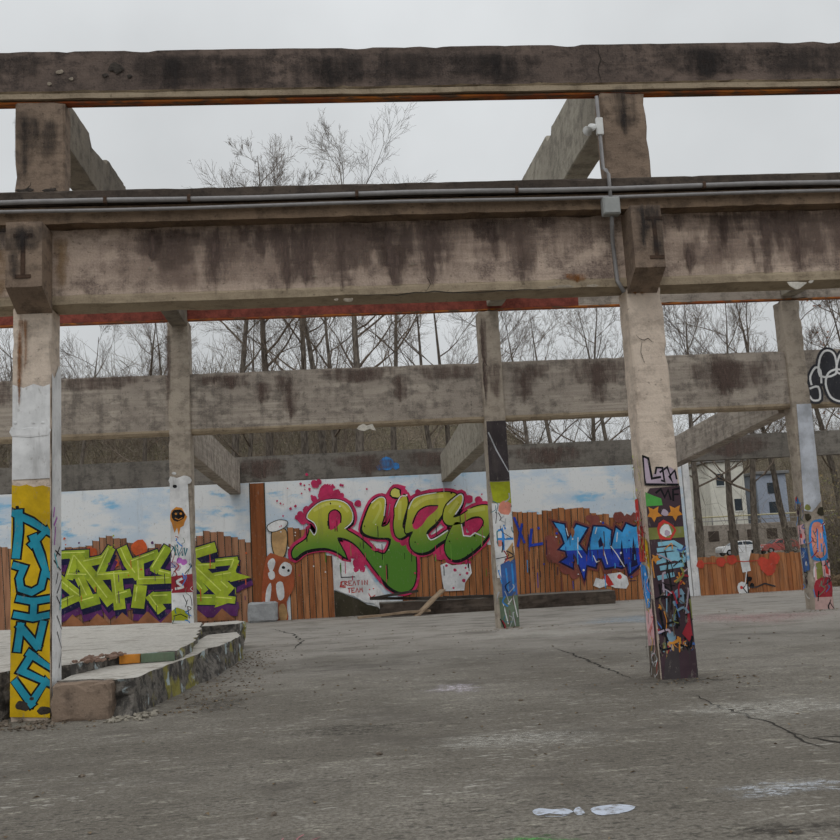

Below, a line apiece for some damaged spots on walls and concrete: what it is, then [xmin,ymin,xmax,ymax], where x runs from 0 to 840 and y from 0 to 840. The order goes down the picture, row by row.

water stain [136,229,234,283]
water stain [239,223,450,288]
rust [17,320,26,400]
water stain [327,368,383,382]
water stain [414,366,473,379]
water stain [692,357,776,395]